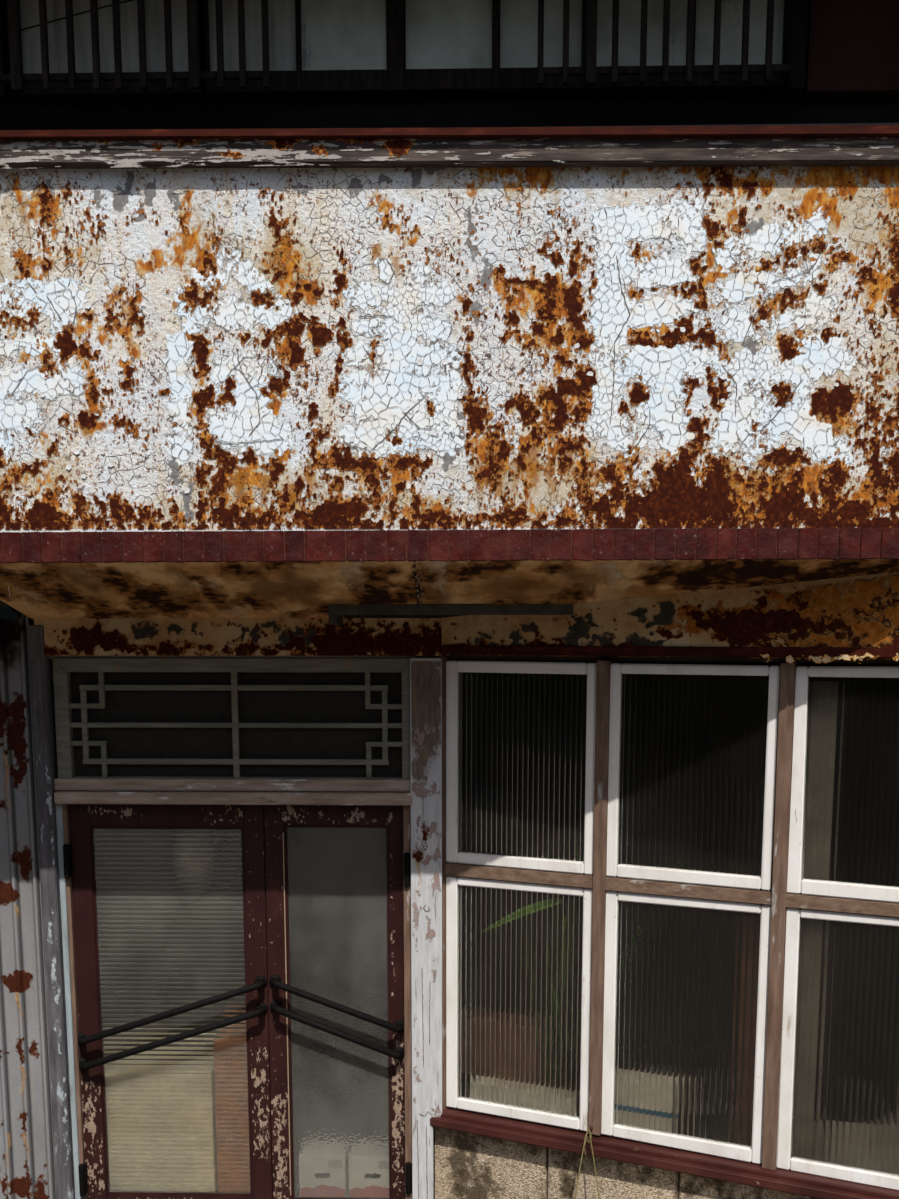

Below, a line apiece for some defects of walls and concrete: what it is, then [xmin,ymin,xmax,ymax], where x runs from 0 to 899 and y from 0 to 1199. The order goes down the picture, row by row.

rust [0,619,26,666]
rust [0,561,658,657]
rust [635,560,899,660]
rust [0,692,29,792]
rust [0,846,33,906]
peeling [390,816,441,952]
rust [0,969,33,1001]
rust [0,1037,40,1072]
rust [0,1111,49,1199]
water stain [443,1129,503,1199]
water stain [528,1152,762,1199]